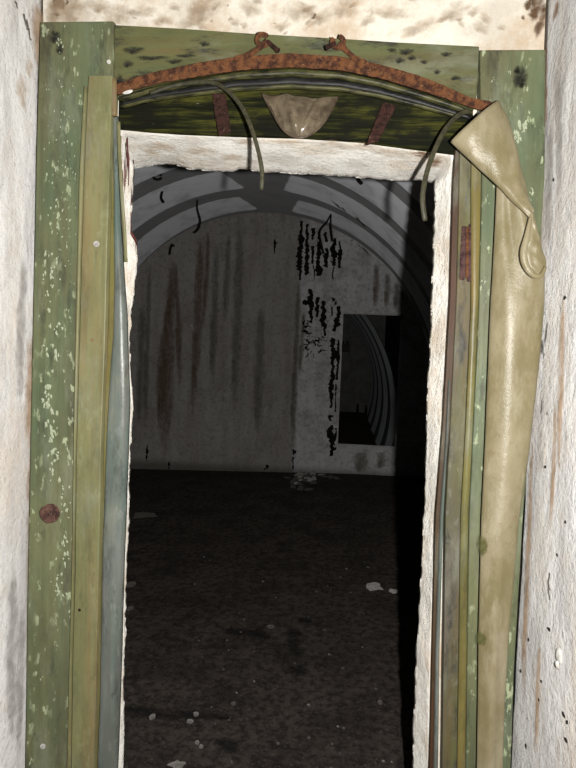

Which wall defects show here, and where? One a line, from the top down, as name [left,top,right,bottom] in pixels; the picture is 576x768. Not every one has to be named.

peeling [513,120,527,143]
peeling [42,250,71,313]
peeling [296,221,343,280]
peeling [302,289,341,456]
peeling [41,384,71,518]
peeling [51,535,69,600]